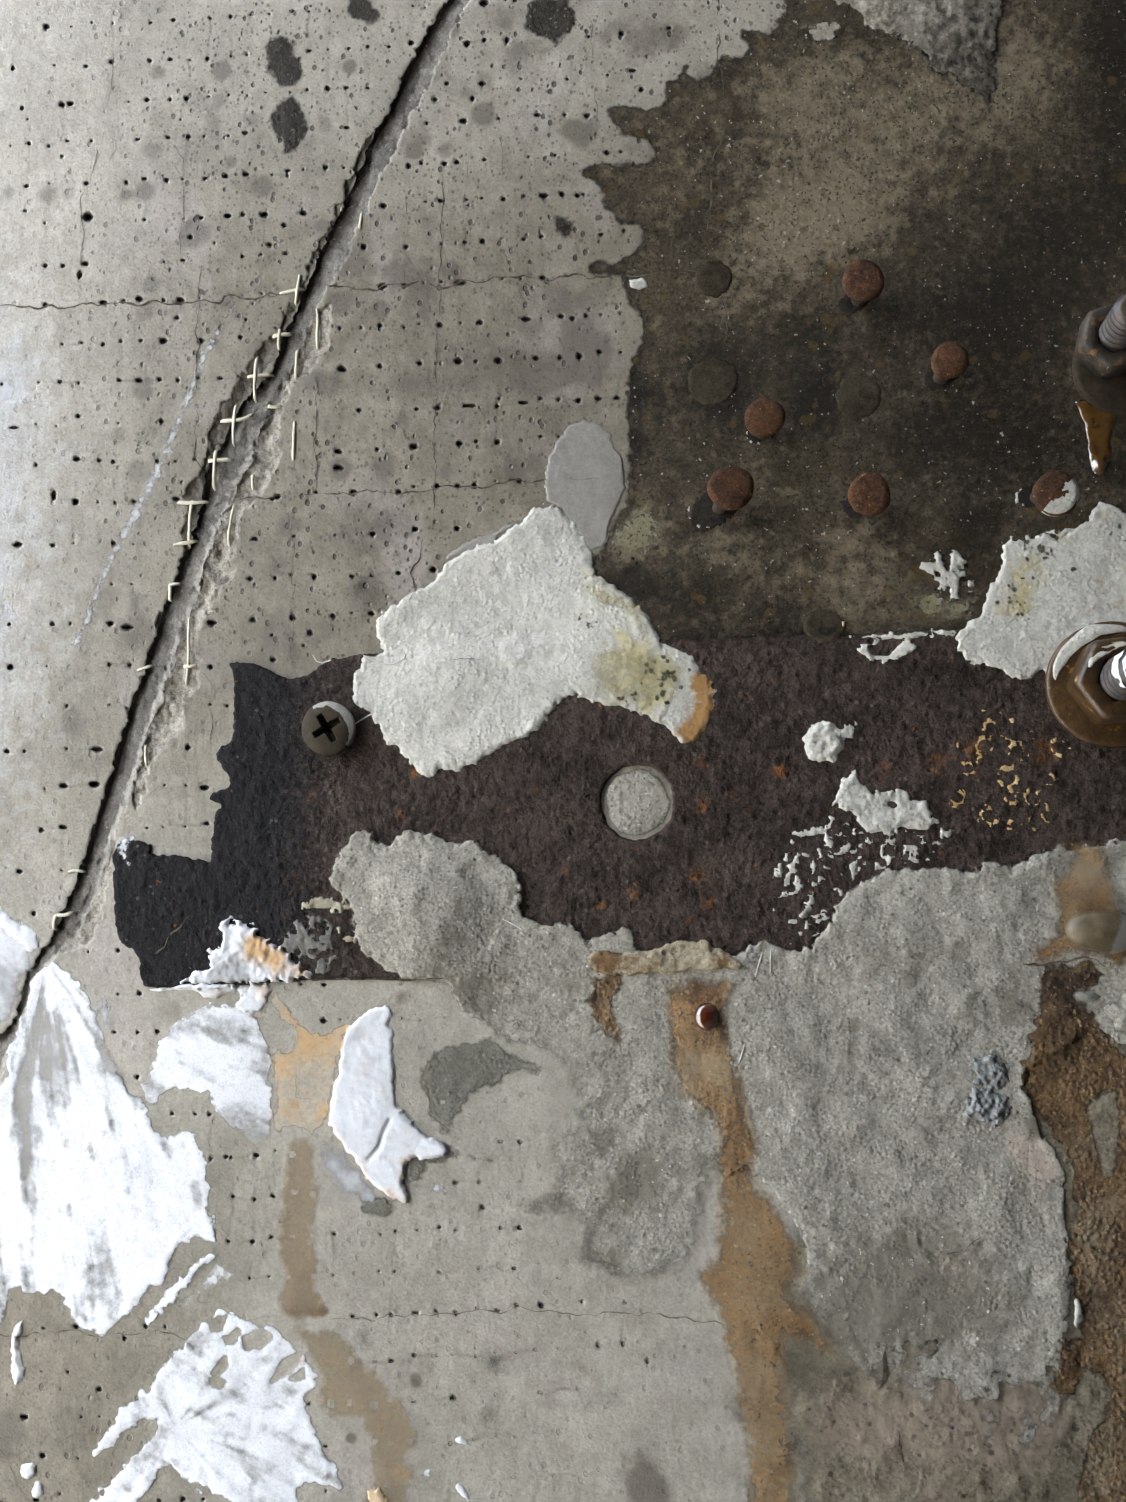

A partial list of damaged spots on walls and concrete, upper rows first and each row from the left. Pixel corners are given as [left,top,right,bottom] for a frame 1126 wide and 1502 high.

crack [0,0,811,597]
damp [582,0,1126,704]
crack [281,537,296,654]
crack [198,668,216,758]
crack [154,916,189,954]
crack [312,975,443,983]
crack [0,1329,186,1340]
peeling [328,1005,448,1203]
rust [667,979,830,1502]
rust [1020,843,1126,1502]